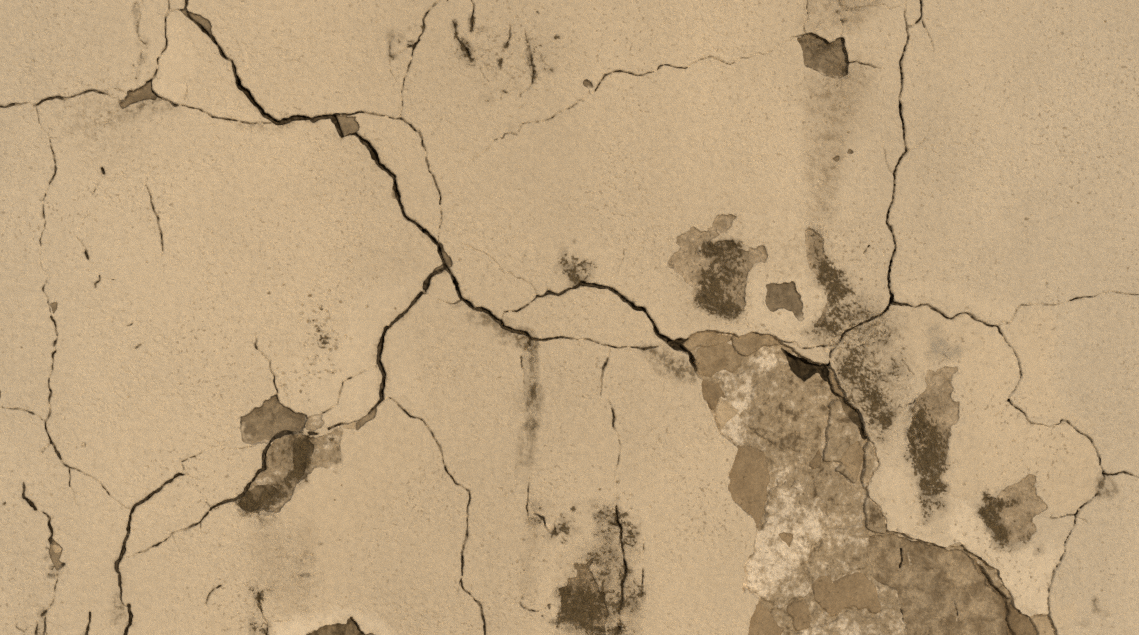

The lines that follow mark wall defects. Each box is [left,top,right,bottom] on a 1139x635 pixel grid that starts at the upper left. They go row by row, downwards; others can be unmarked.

spalling [797,32,849,78]
crack [0,0,808,635]
peeling [667,214,768,318]
peeling [765,227,840,328]
leakage [808,231,951,521]
crack [781,0,1139,614]
spalling [238,393,377,513]
spalling [306,617,374,635]
leakage [549,505,646,635]
spalling [663,330,1057,635]
leakage [978,492,1039,555]